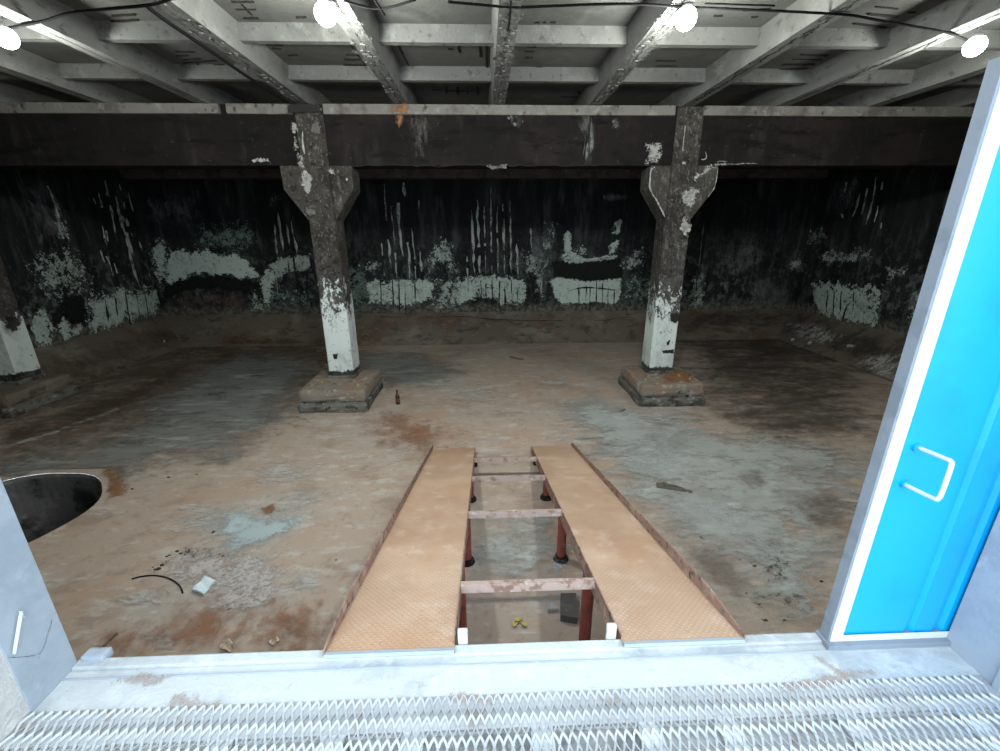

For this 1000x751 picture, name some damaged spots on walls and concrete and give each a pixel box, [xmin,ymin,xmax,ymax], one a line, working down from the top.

corrosion [392,103,408,127]
water stain [60,292,94,328]
water stain [93,182,143,288]
water stain [163,275,263,313]
peeling [0,196,528,375]
water stain [381,183,422,279]
water stain [466,186,623,297]
peeling [550,162,727,377]
corrosion [103,466,127,497]
water stain [555,314,902,617]